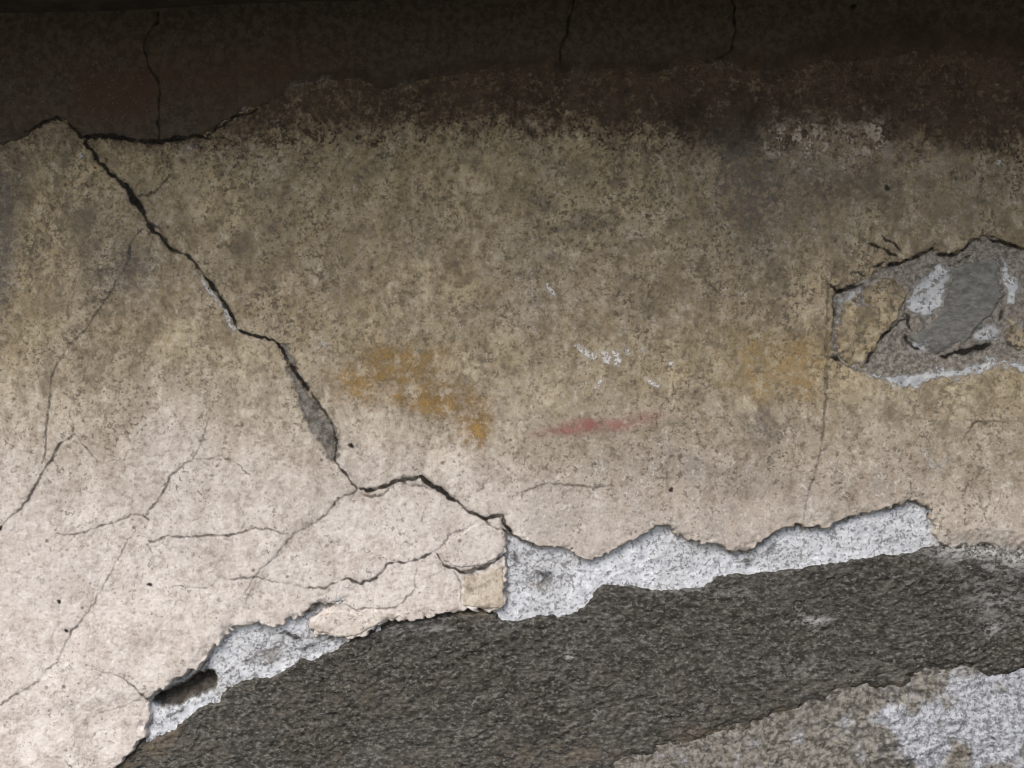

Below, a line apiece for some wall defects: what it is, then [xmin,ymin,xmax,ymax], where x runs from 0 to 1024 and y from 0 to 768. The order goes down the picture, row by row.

water stain [194,24,1024,233]
crack [26,13,512,533]
spalling [831,236,1024,388]
crack [17,368,69,511]
crack [147,465,290,552]
crack [305,553,502,612]
spalling [439,501,939,621]
spalling [146,581,399,742]
spalling [613,664,1024,768]